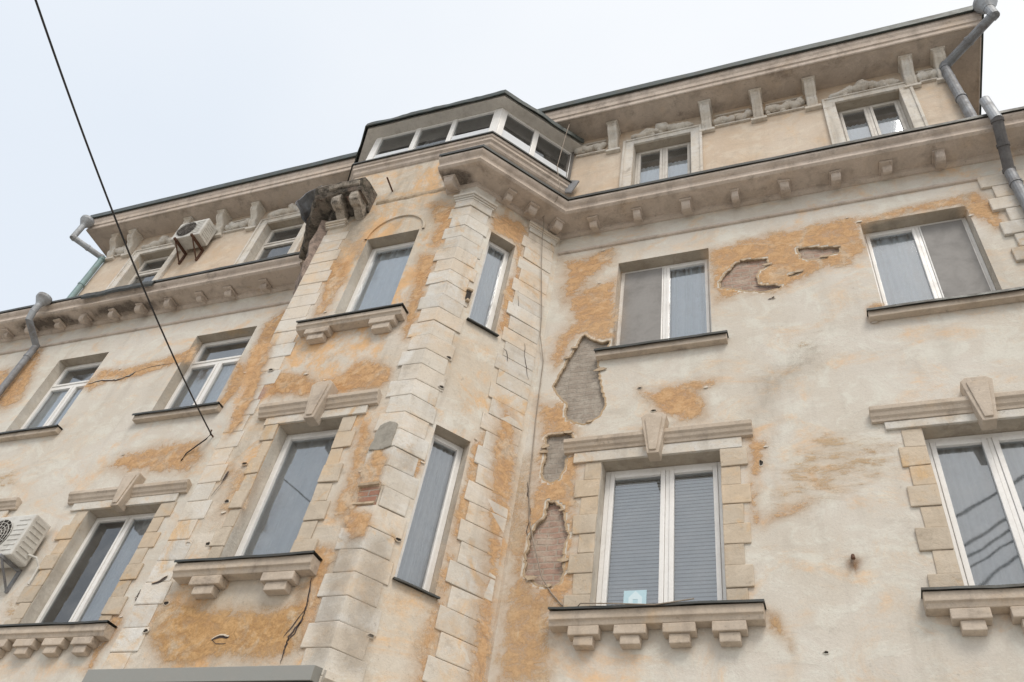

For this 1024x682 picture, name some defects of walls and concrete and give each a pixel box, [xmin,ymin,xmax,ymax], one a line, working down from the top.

spalling [299,177,377,261]
peeling [709,192,1002,300]
crack [88,363,171,384]
peeling [110,440,202,472]
peeling [220,311,391,434]
peeling [334,424,387,539]
spalling [453,248,619,607]
peeling [637,379,715,421]
crack [280,578,312,663]
peeling [468,599,494,682]